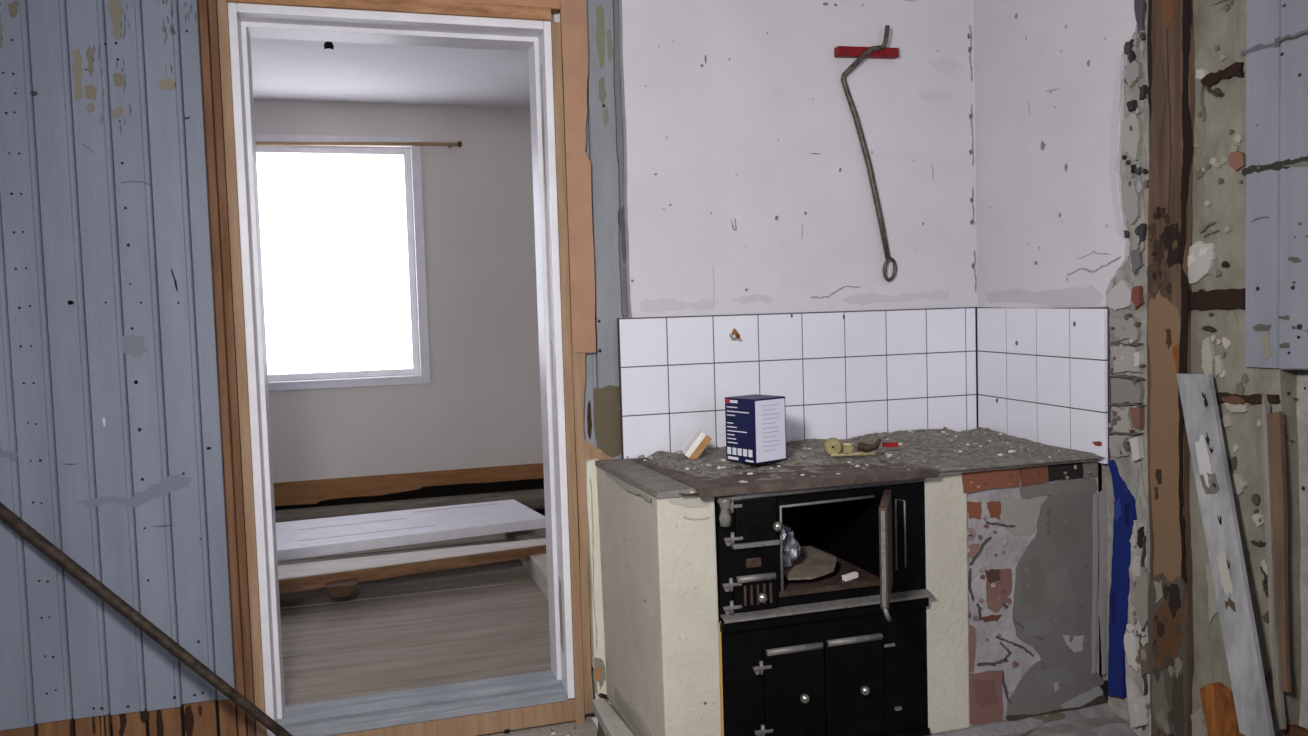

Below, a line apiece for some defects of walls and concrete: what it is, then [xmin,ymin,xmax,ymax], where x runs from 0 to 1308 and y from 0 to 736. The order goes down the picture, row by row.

peeling [73,45,97,113]
spalling [1196,69,1209,80]
peeling [1188,241,1216,284]
flaking render [962,0,1151,736]
peeling [1201,337,1225,377]
peeling [1223,402,1249,413]
peeling [1230,473,1249,495]